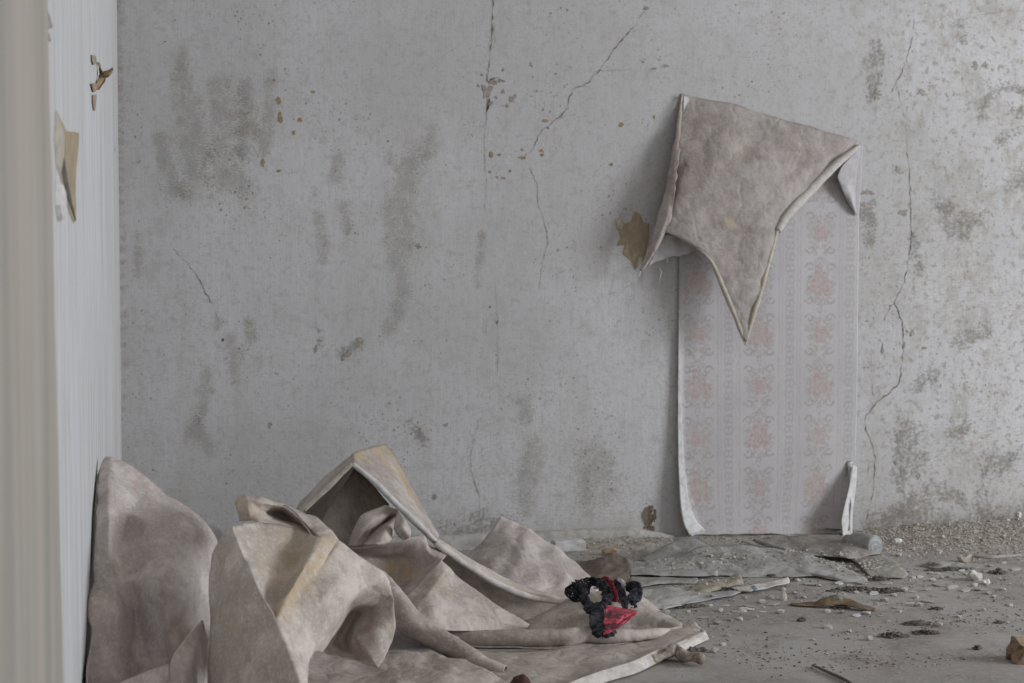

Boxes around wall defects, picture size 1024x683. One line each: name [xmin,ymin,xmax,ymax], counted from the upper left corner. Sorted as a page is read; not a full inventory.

peeling [54,111,79,223]
peeling [91,55,113,111]
crack [484,1,506,208]
crack [529,10,662,297]
peeling [615,211,649,270]
crack [865,18,915,520]